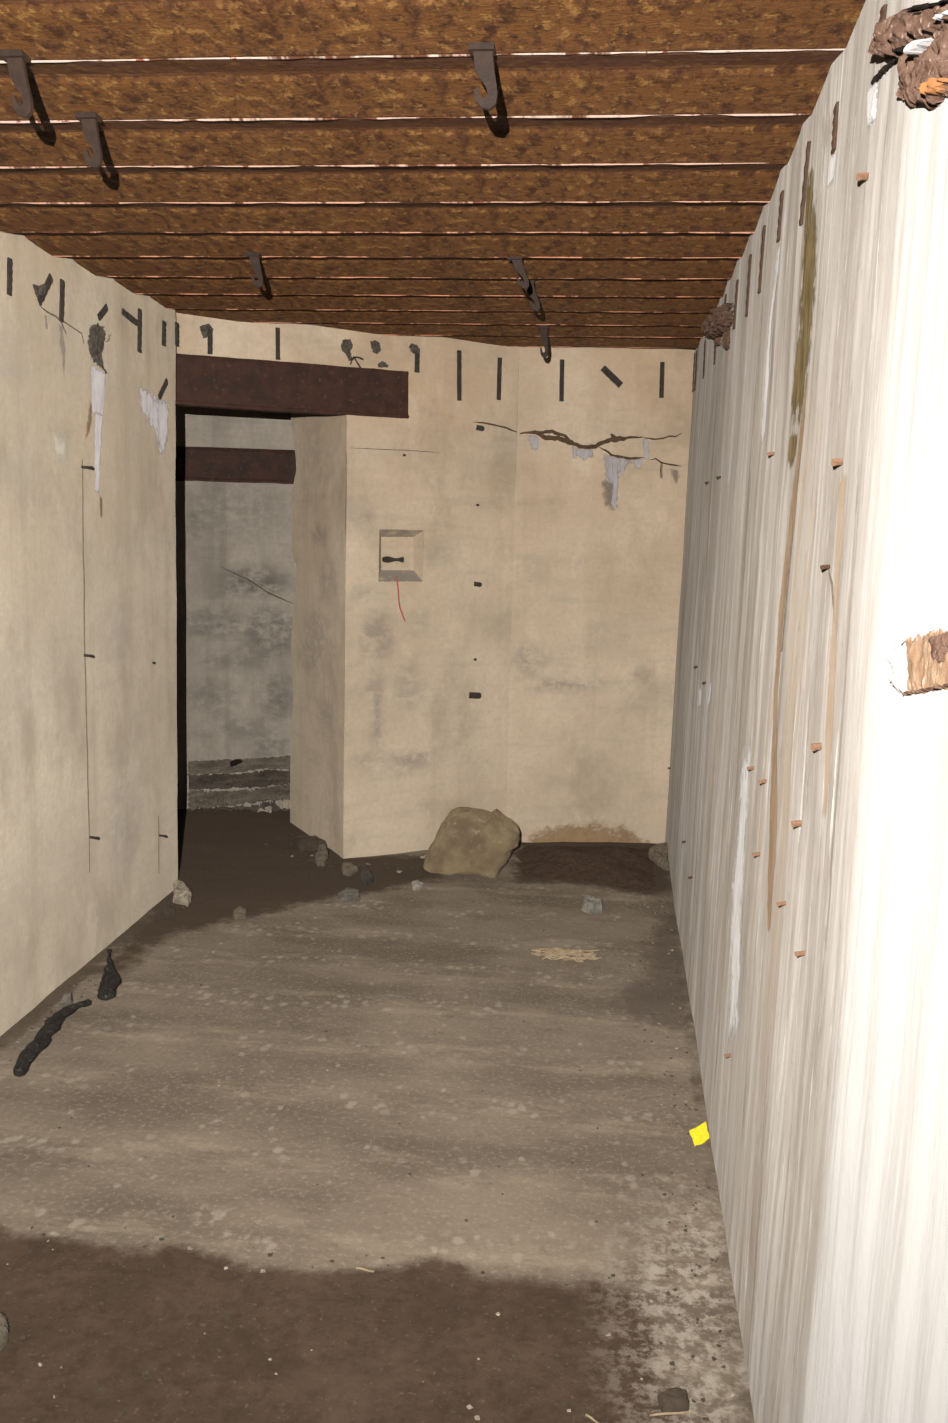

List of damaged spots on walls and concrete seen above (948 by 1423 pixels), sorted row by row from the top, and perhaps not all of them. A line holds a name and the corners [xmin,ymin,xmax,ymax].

spalling [868,0,948,127]
crack [475,422,682,477]
water stain [788,434,797,465]
spalling [886,628,948,698]